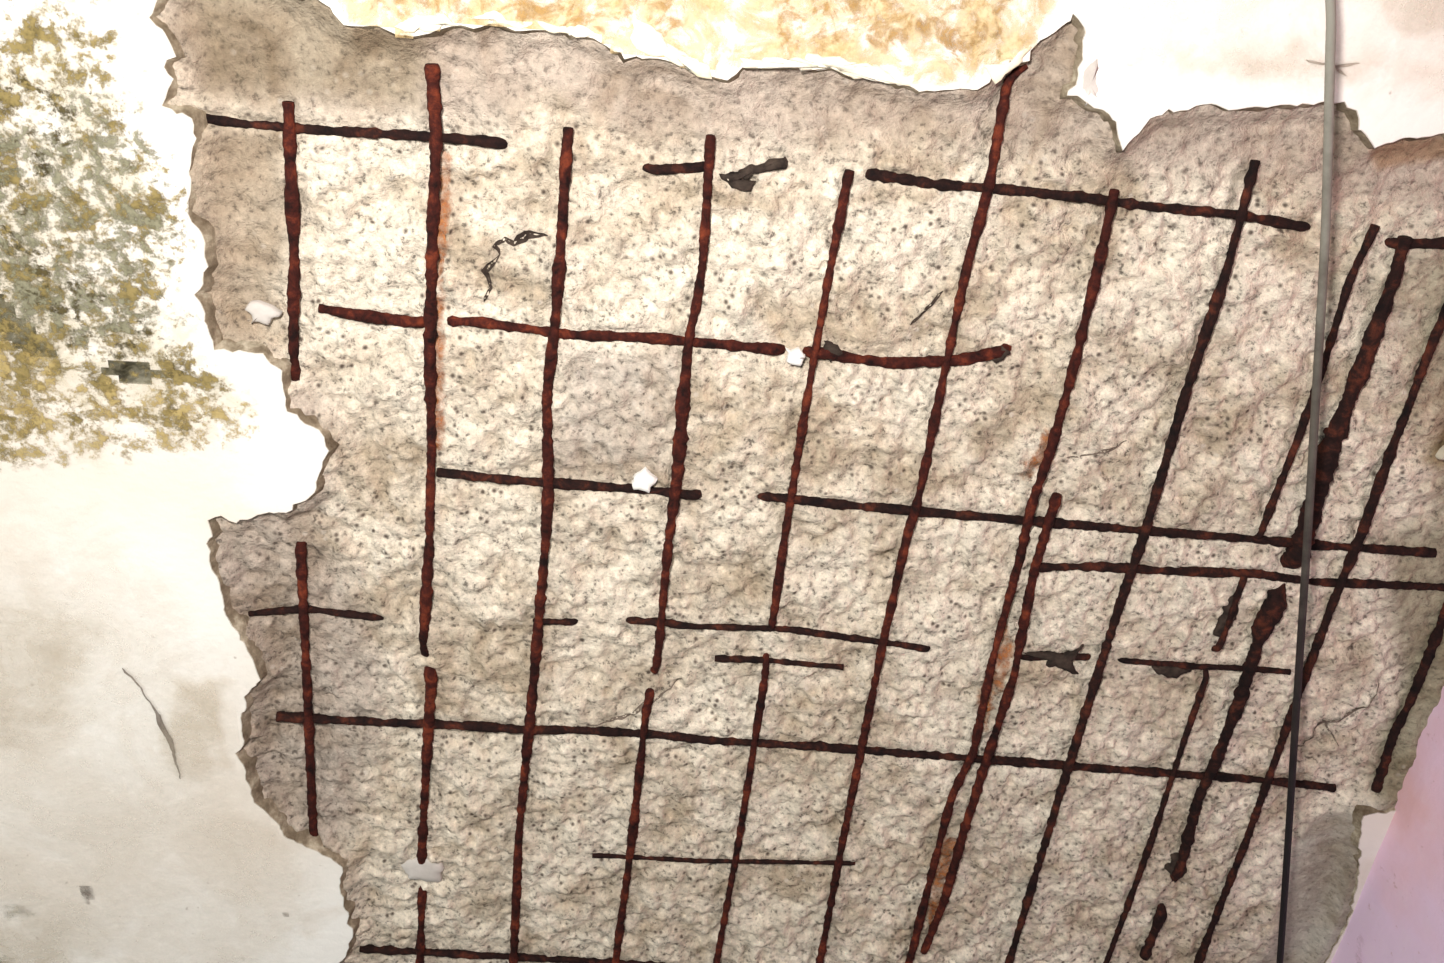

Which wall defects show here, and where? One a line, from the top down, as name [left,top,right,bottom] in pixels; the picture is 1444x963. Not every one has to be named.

rust [719,156,788,191]
leakage [0,5,255,466]
rust [437,175,449,265]
rust [823,340,843,363]
rust [992,345,1011,364]
spalling [149,0,1032,963]
spalling [816,14,1324,963]
spalling [1283,101,1444,963]
rust [1213,595,1239,637]
rust [978,628,1084,723]
rust [1151,666,1192,678]
rust [1164,852,1187,883]